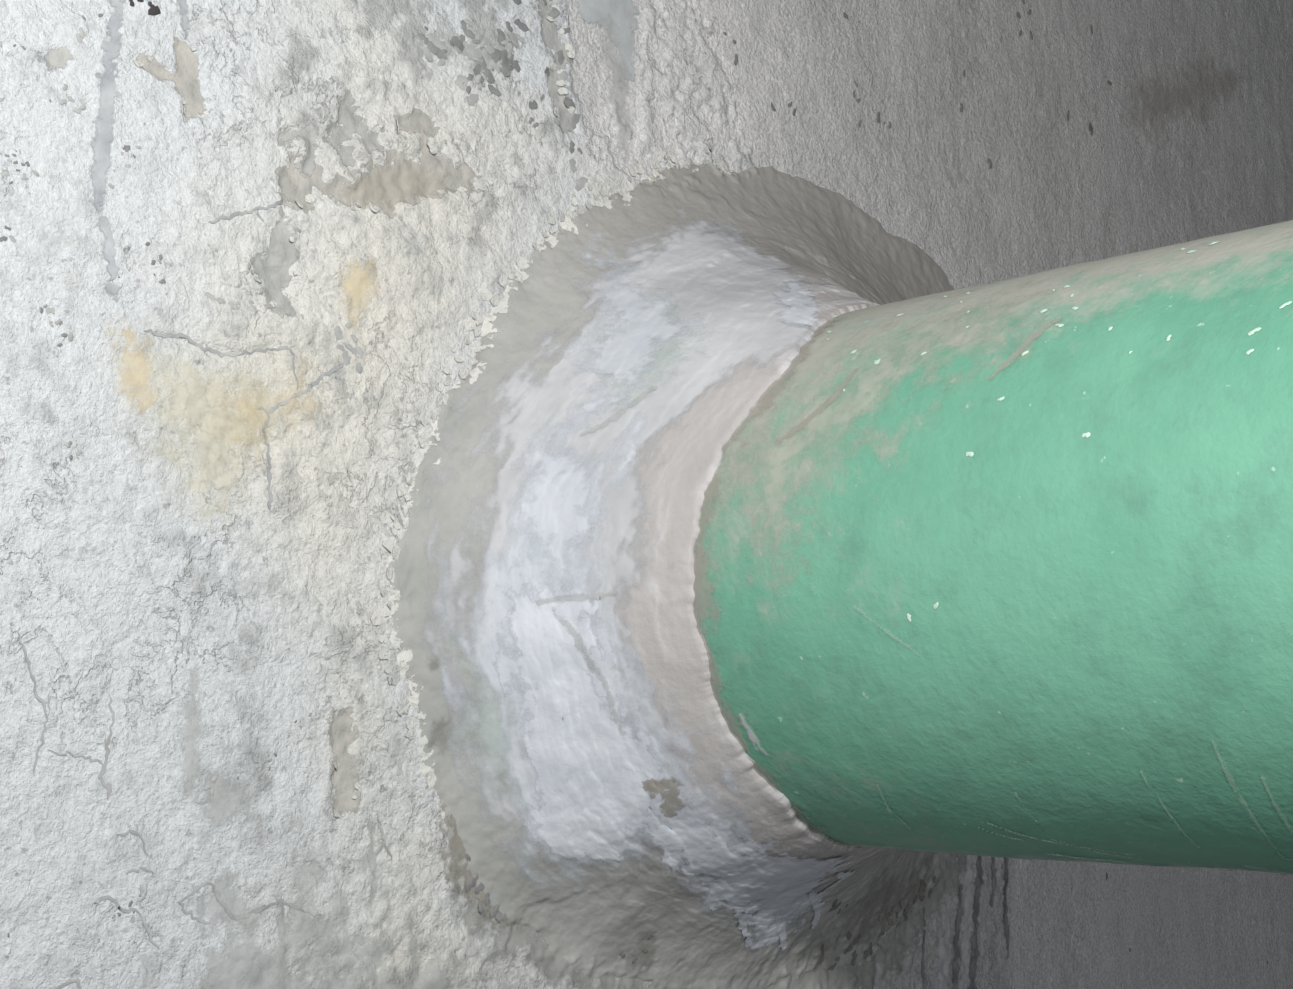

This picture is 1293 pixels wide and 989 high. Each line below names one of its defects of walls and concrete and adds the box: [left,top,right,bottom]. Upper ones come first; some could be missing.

leakage [179,0,190,38]
leakage [82,0,161,301]
peeling [205,83,494,319]
peeling [370,0,830,857]
leakage [813,855,1010,989]